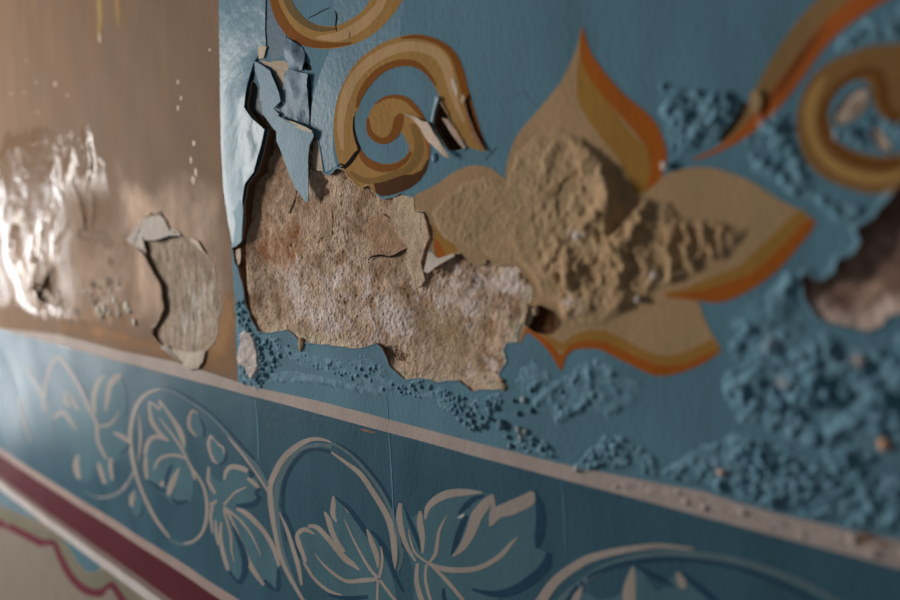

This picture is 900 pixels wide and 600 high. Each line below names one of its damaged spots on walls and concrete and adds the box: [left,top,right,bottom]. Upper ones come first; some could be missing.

spalling [127,0,539,393]
spalling [797,181,900,335]